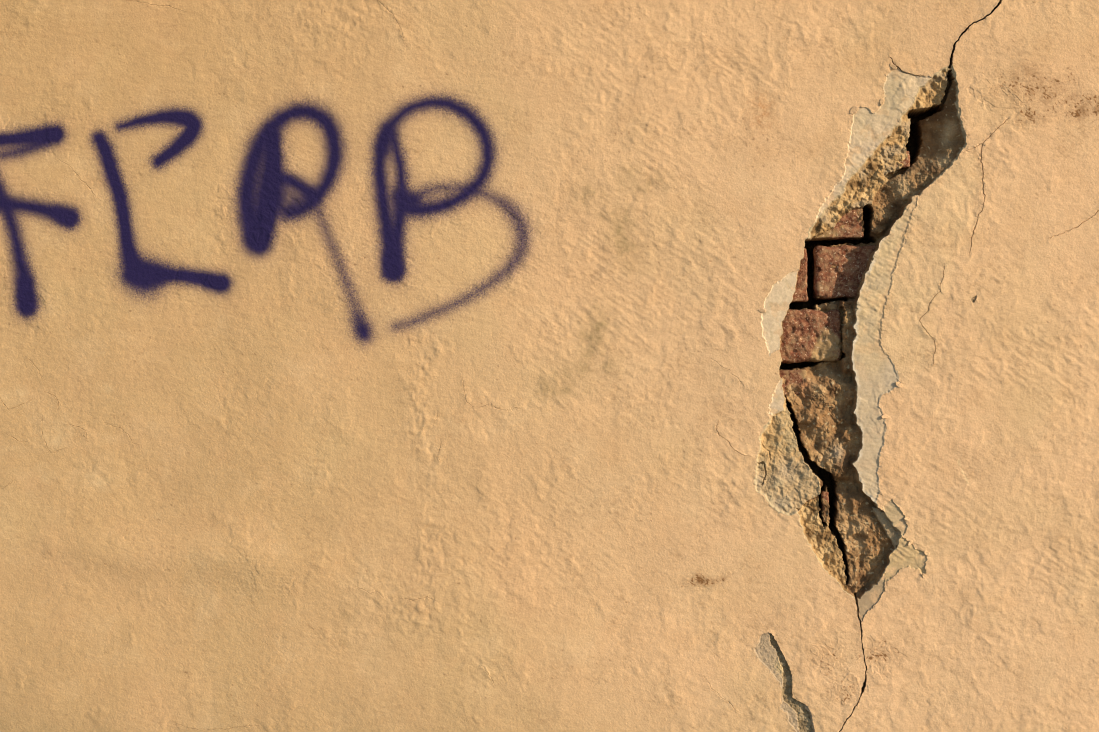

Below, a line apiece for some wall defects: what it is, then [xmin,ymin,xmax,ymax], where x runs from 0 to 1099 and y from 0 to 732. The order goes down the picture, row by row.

crack [949,0,1002,65]
flaking render [754,63,967,623]
flaking render [754,632,815,732]
crack [839,604,867,732]